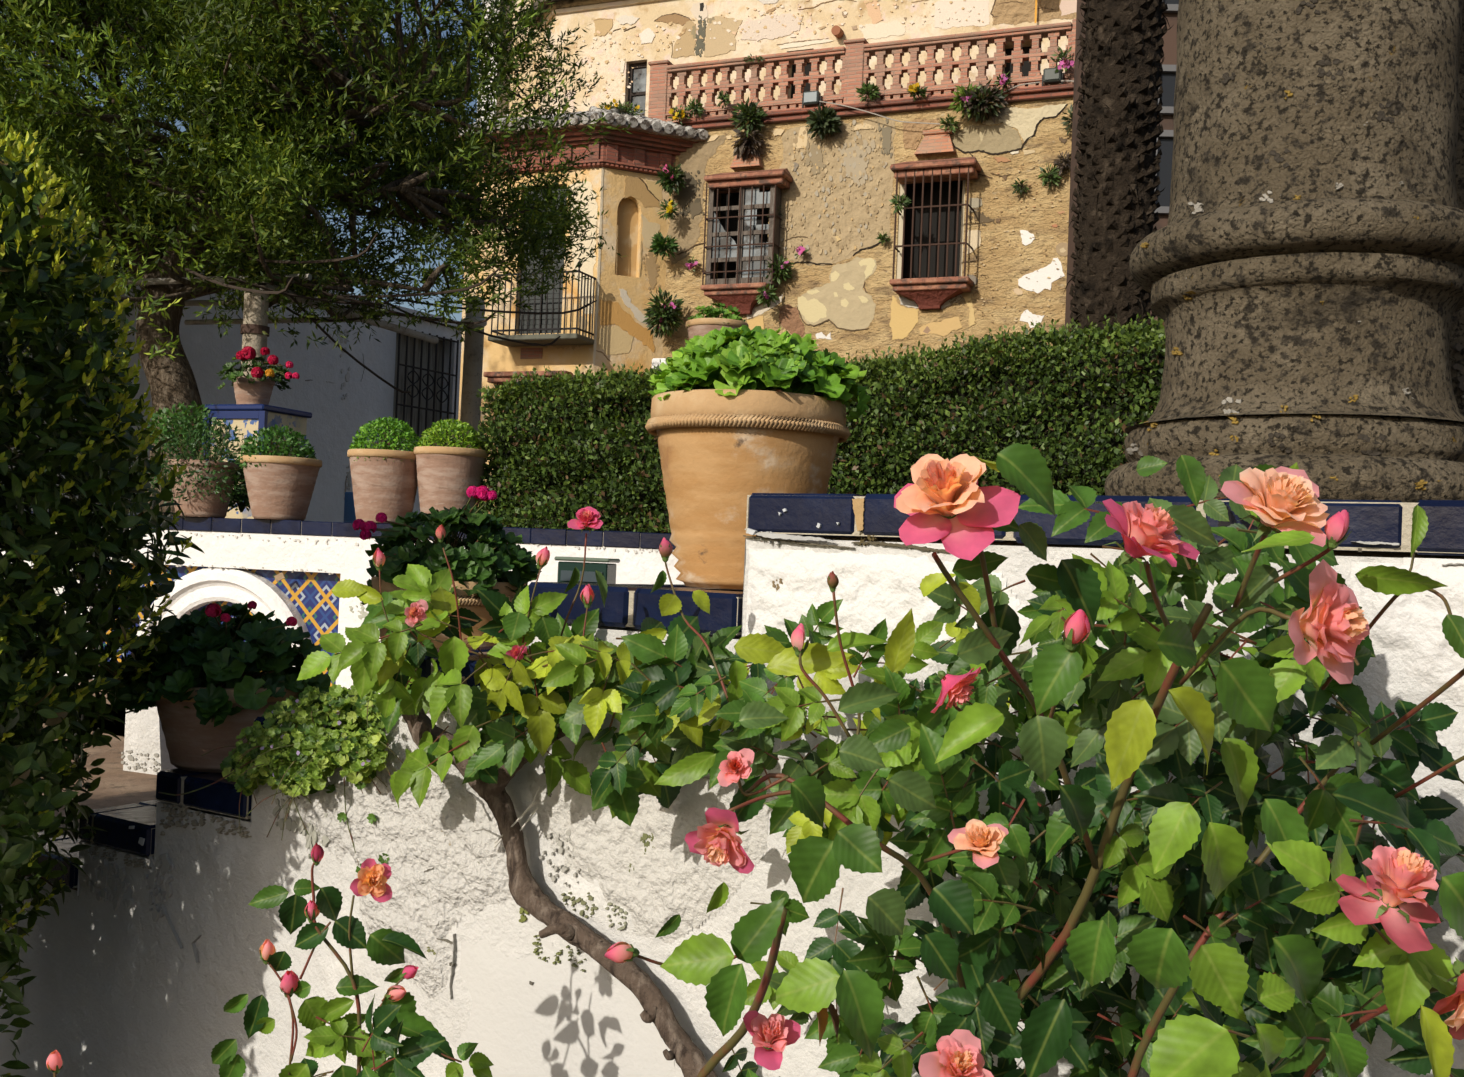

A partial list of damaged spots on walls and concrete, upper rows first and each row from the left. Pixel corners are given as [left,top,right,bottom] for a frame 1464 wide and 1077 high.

flaking render [616,2,708,45]
peeling [739,0,834,49]
peeling [842,6,907,39]
crack [953,104,1068,178]
flaking render [746,257,877,346]
peeling [899,297,918,309]
peeling [1013,248,1066,328]